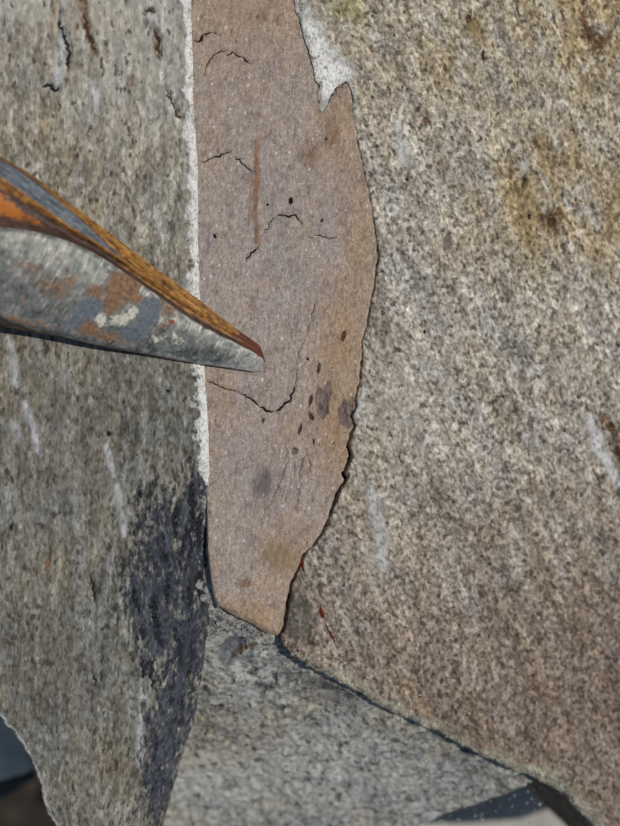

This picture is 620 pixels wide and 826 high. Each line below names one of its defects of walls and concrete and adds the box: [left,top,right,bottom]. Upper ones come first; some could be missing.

corrosion [79,0,97,55]
crack [192,32,250,73]
spalling [294,0,358,117]
damp [179,0,200,300]
crack [201,152,253,173]
crack [246,214,332,260]
crack [207,299,316,413]
damp [104,445,114,475]
crack [322,446,351,530]
damp [115,363,249,826]